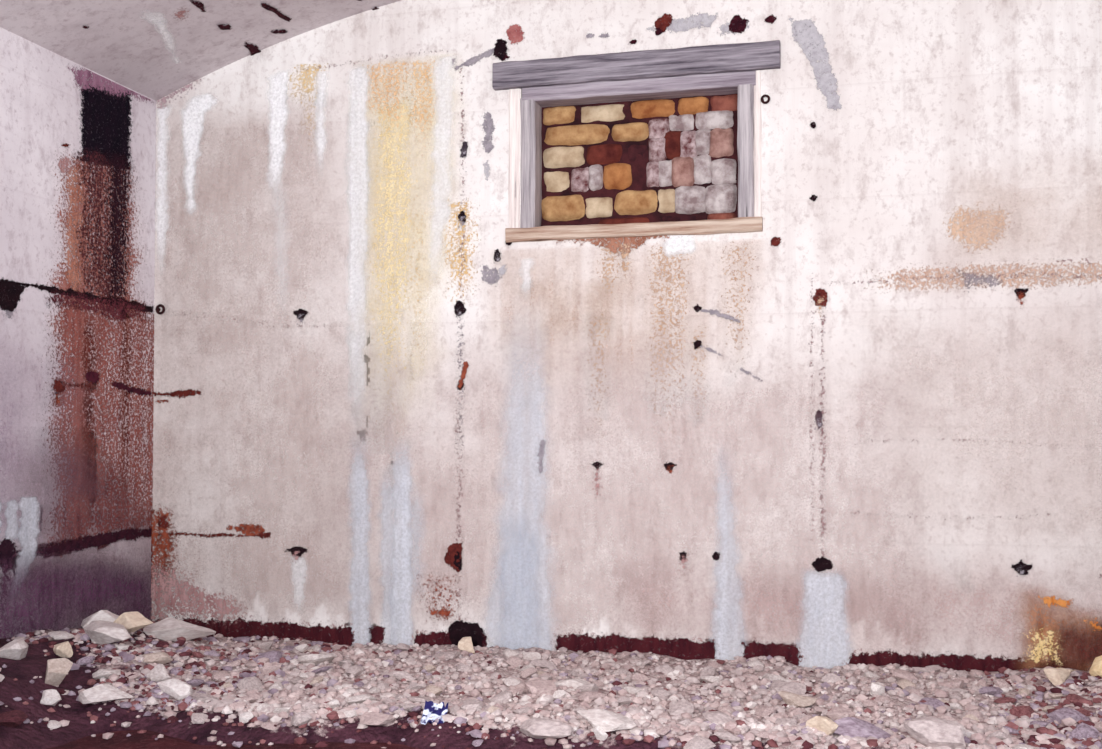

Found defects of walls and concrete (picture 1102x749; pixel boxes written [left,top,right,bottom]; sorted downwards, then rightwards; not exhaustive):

rust [41,154,251,626]
crack [0,277,314,327]
water stain [155,63,328,366]
water stain [348,57,479,401]
water stain [0,235,1102,672]